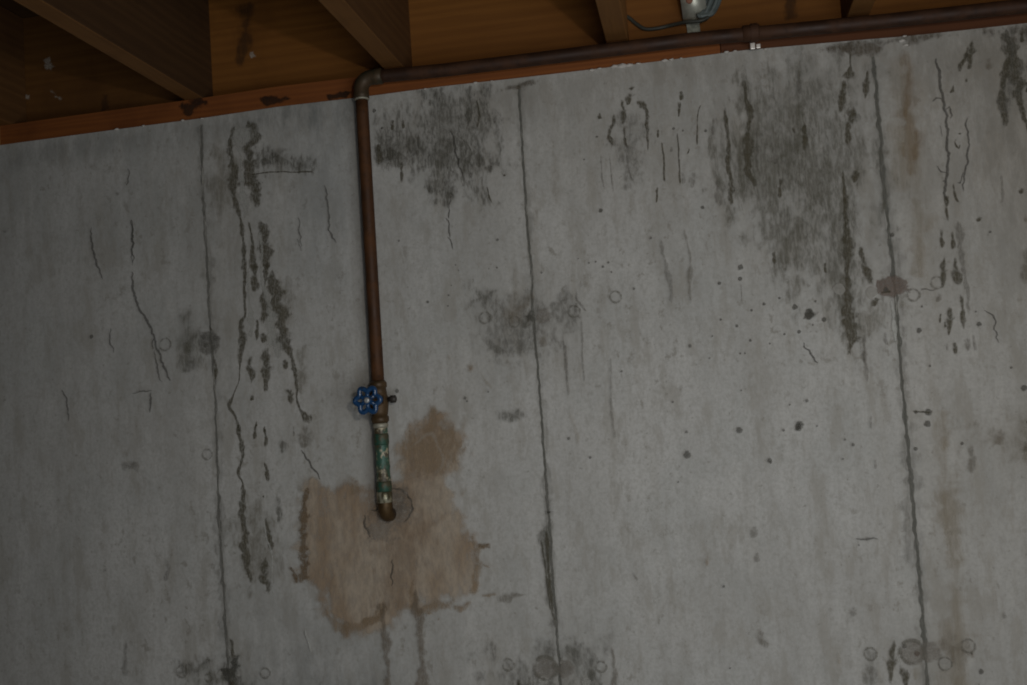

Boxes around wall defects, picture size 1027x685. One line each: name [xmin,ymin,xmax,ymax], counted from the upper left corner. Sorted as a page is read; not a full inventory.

leakage [375,80,505,206]
leakage [724,111,735,203]
leakage [742,81,756,185]
leakage [828,41,881,145]
crack [933,59,970,217]
leakage [998,29,1027,124]
crack [130,221,168,379]
leakage [227,122,315,589]
leakage [841,171,872,353]